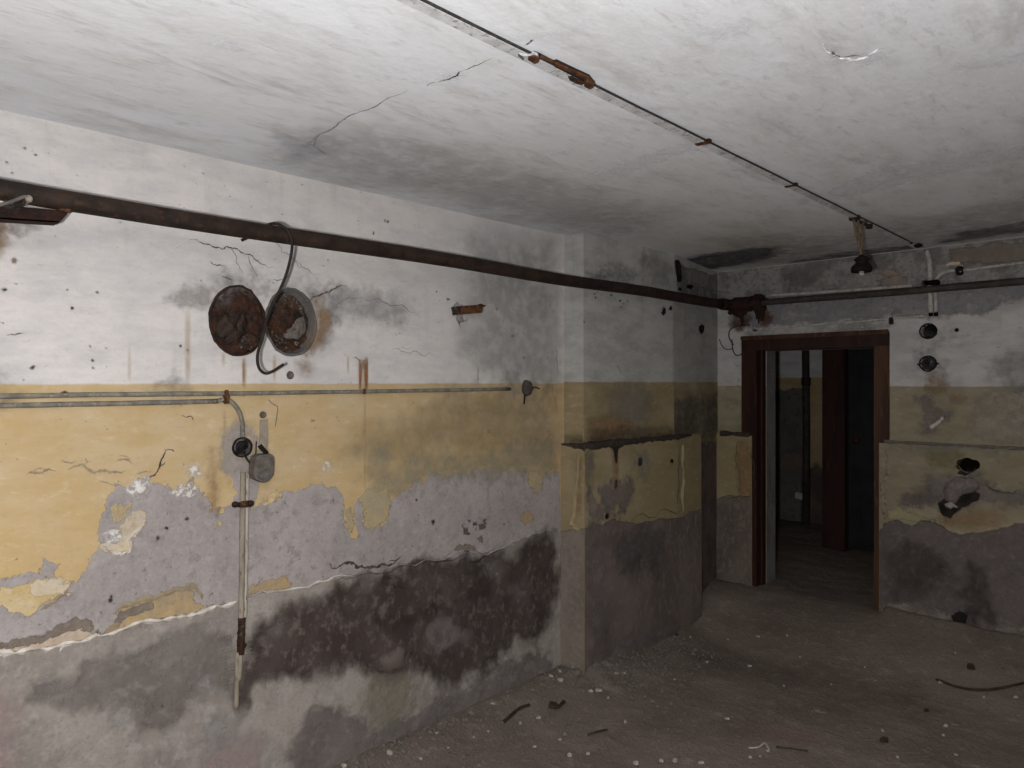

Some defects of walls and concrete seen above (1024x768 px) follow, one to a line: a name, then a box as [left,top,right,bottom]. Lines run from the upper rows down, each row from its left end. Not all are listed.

crack [303,59,490,155]
crack [190,239,412,313]
crack [28,449,174,486]
peeling [0,467,561,768]
water stain [34,528,584,768]
crack [330,557,400,569]
peeling [585,442,751,674]
peeling [879,449,1024,635]